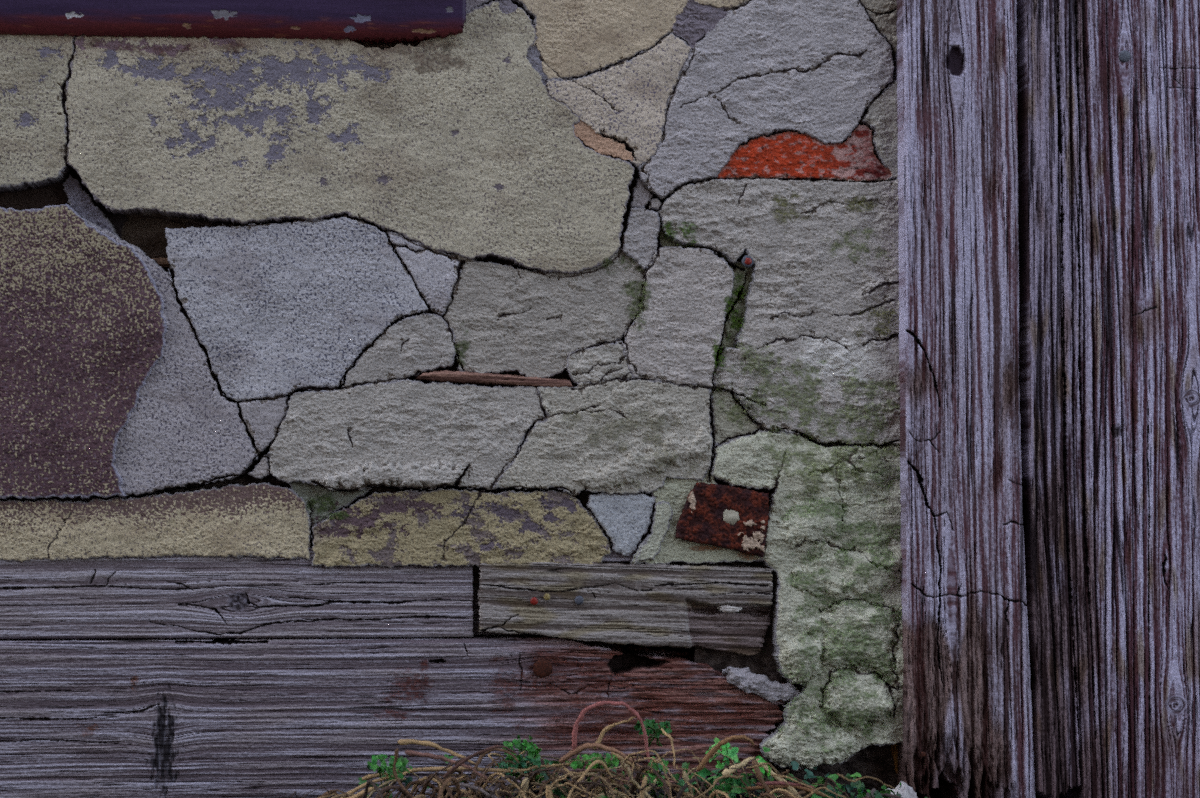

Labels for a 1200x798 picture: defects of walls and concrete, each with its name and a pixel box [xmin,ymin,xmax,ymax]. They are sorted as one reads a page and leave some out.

peeling [211,10,237,21]
peeling [14,111,39,128]
crack [61,36,76,171]
peeling [36,14,437,171]
spalling [717,125,892,182]
spalling [0,169,187,273]
crack [131,0,1027,718]
rust [738,521,766,558]
crack [0,512,771,699]